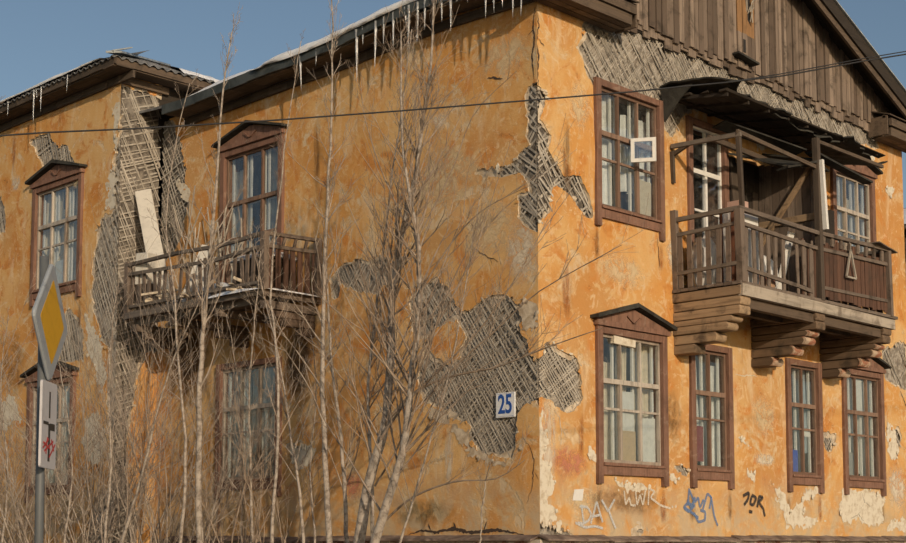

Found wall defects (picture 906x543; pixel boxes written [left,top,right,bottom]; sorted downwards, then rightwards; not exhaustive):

crack [528,8,544,85]
spalling [576,21,879,161]
spalling [29,133,74,167]
spalling [474,82,593,232]
spalling [329,256,403,300]
spalling [59,84,191,543]
spalling [882,341,906,390]
spalling [408,277,583,539]
peeling [885,422,902,460]
peeling [773,483,826,530]
peeling [839,488,906,533]